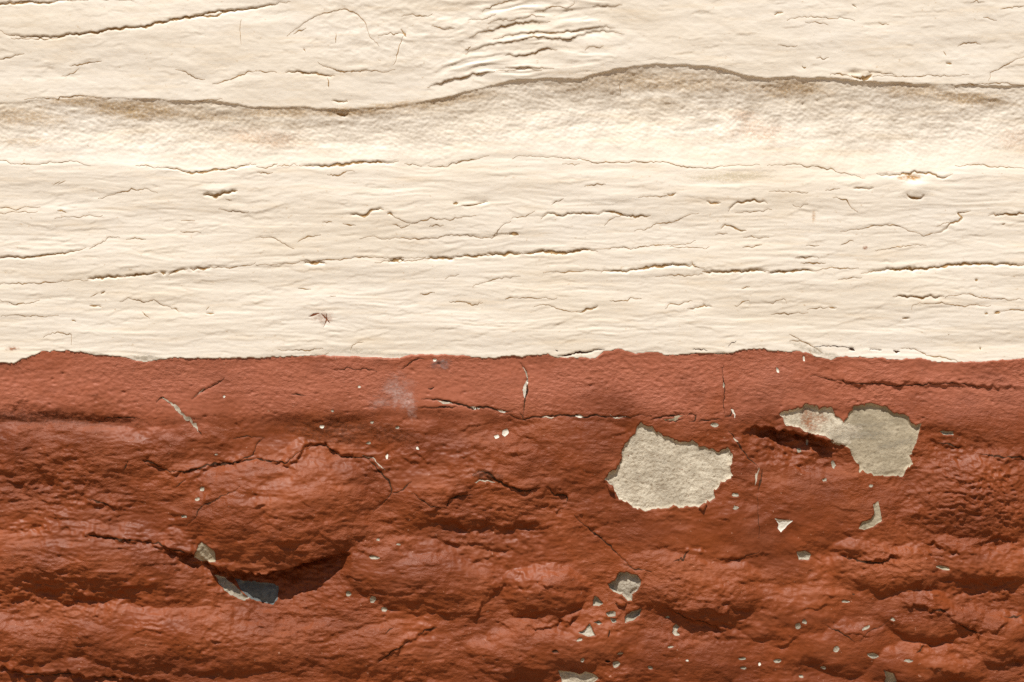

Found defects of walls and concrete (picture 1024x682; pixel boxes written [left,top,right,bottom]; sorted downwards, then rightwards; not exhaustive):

crack [0,0,425,116]
crack [783,42,1024,89]
crack [2,155,1024,389]
crack [157,378,224,435]
crack [124,435,568,509]
crack [419,341,763,561]
peeling [605,423,733,512]
peeling [779,403,921,487]
peeling [859,501,882,530]
peeling [215,575,279,605]
peeling [577,572,641,641]
peeling [559,658,598,682]